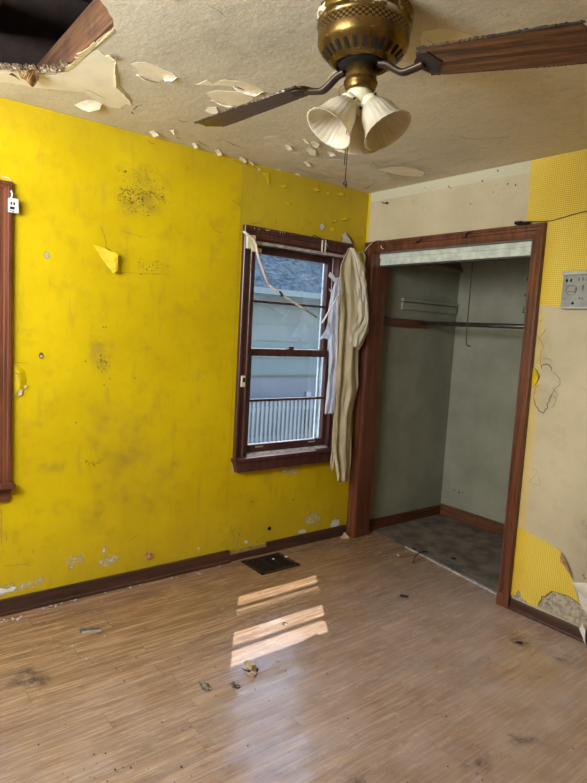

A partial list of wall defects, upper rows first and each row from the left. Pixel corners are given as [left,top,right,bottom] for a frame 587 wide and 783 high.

peeling [0,29,132,114]
peeling [131,62,180,83]
peeling [196,80,266,114]
peeling [302,139,320,167]
peeling [93,229,124,274]
flaking render [0,579,42,596]
flaking render [538,591,587,626]